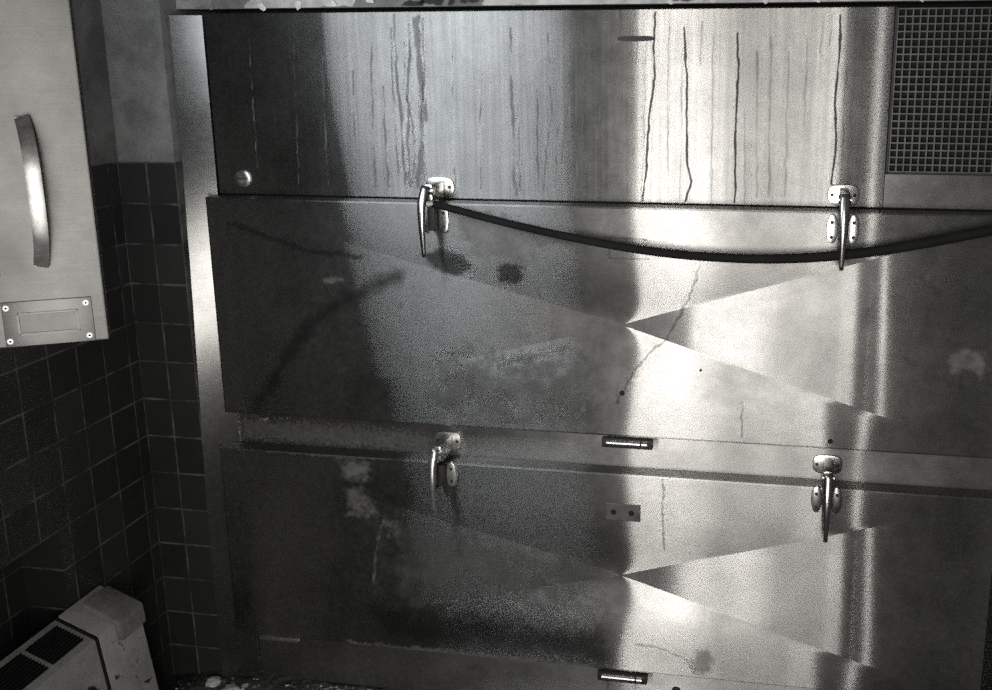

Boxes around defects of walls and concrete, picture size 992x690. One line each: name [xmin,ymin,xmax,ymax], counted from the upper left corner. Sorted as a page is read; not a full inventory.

peeling [176,0,214,10]
peeling [244,0,374,11]